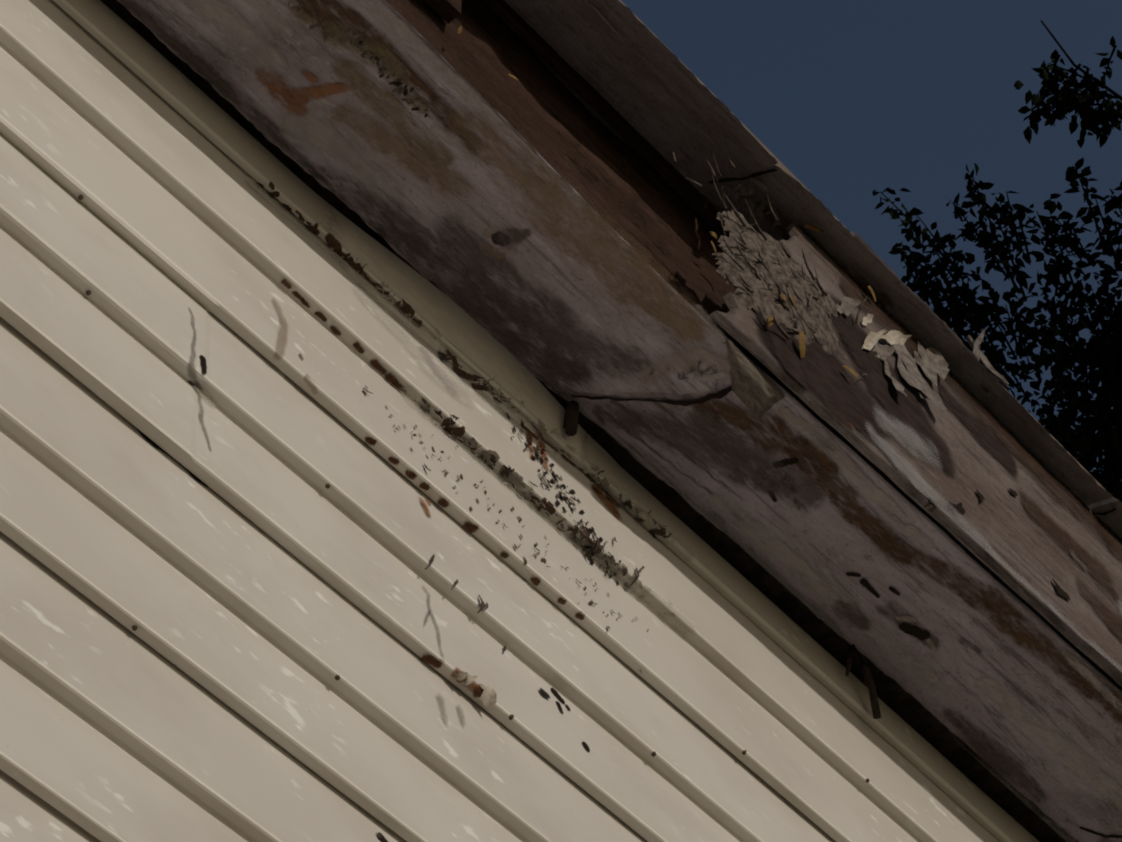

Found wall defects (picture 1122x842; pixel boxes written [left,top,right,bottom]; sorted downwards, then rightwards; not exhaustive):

corrosion [255,70,355,116]
leakage [118,0,706,398]
peeling [836,296,950,412]
peeling [965,329,1009,386]
corrosion [388,457,448,517]
peeling [256,182,672,630]
corrosion [527,430,548,470]
corrosion [592,485,643,522]
crack [571,386,732,455]
leakage [938,370,1122,559]
leakage [593,399,1122,724]